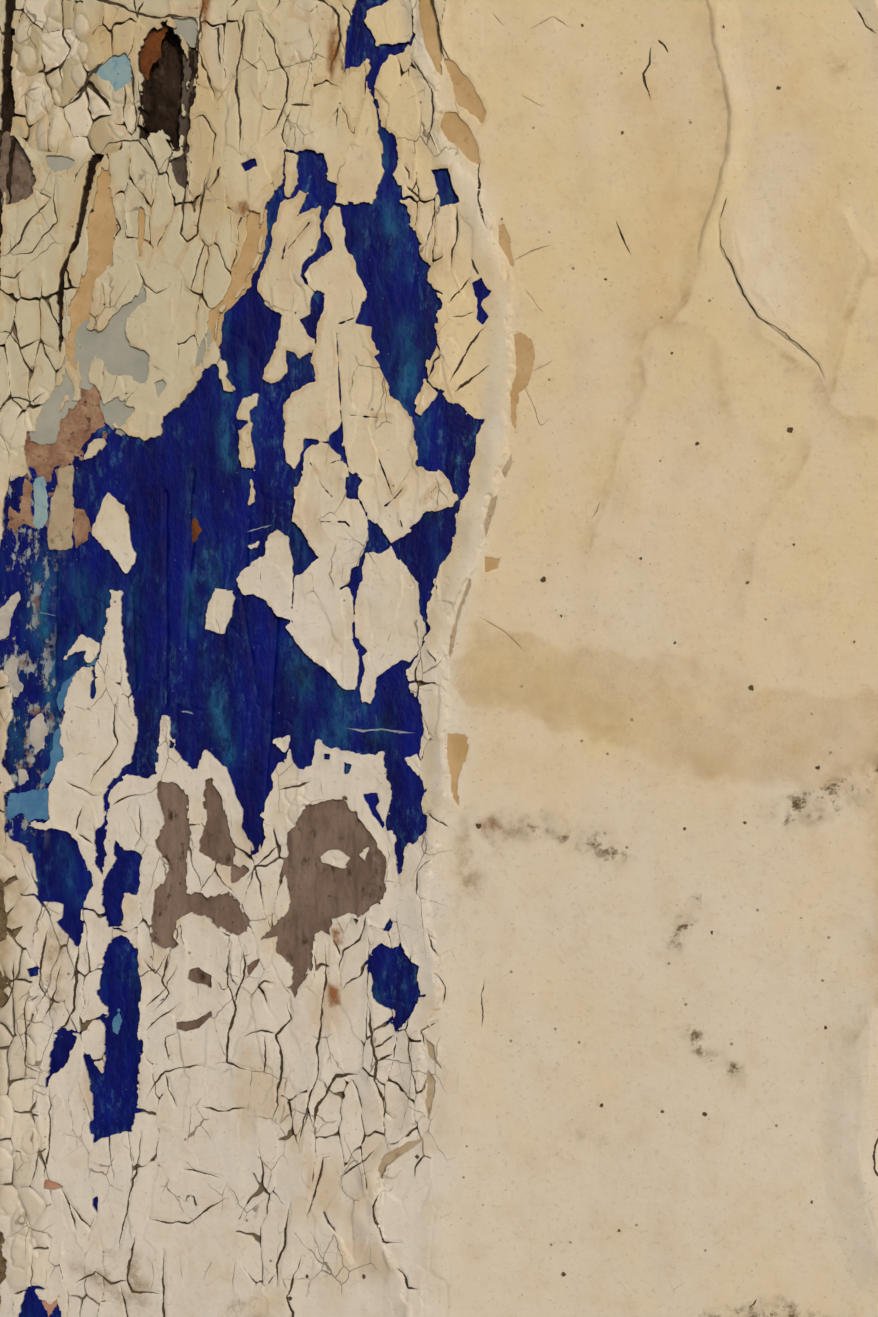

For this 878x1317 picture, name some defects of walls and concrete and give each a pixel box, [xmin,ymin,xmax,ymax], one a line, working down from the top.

crack [318,0,342,78]
crack [0,0,309,352]
peeling [498,218,514,267]
peeling [472,278,491,325]
crack [719,200,824,376]
peeling [0,0,487,1143]
peeling [45,1173,63,1189]
crack [0,927,225,1317]
crack [145,917,446,1317]
peeling [379,1134,423,1179]
crack [870,1139,878,1176]
peeling [19,1286,61,1317]